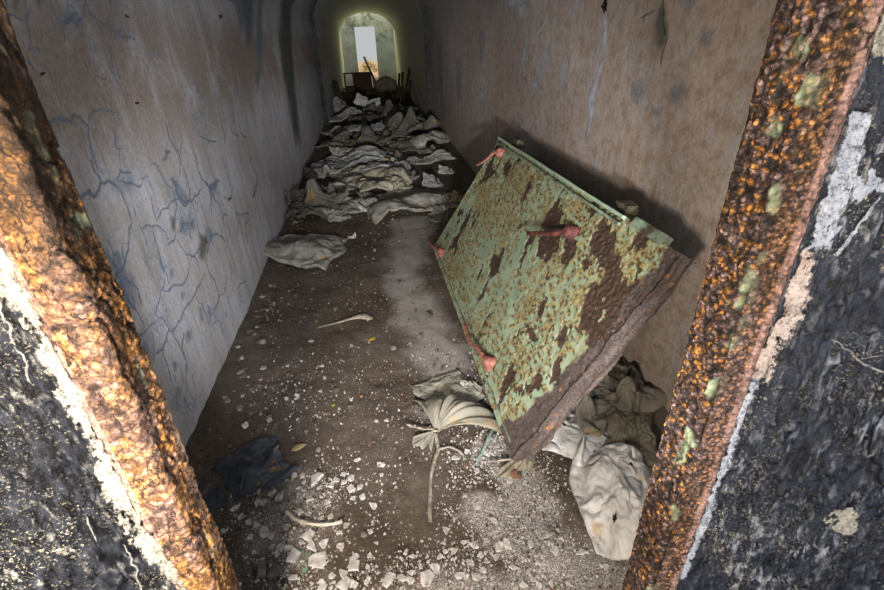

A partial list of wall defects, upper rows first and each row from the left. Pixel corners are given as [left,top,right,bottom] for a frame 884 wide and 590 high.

damp [280,0,299,138]
crack [641,0,668,63]
crack [8,0,272,395]
crack [0,305,28,379]
flaking render [680,111,884,579]